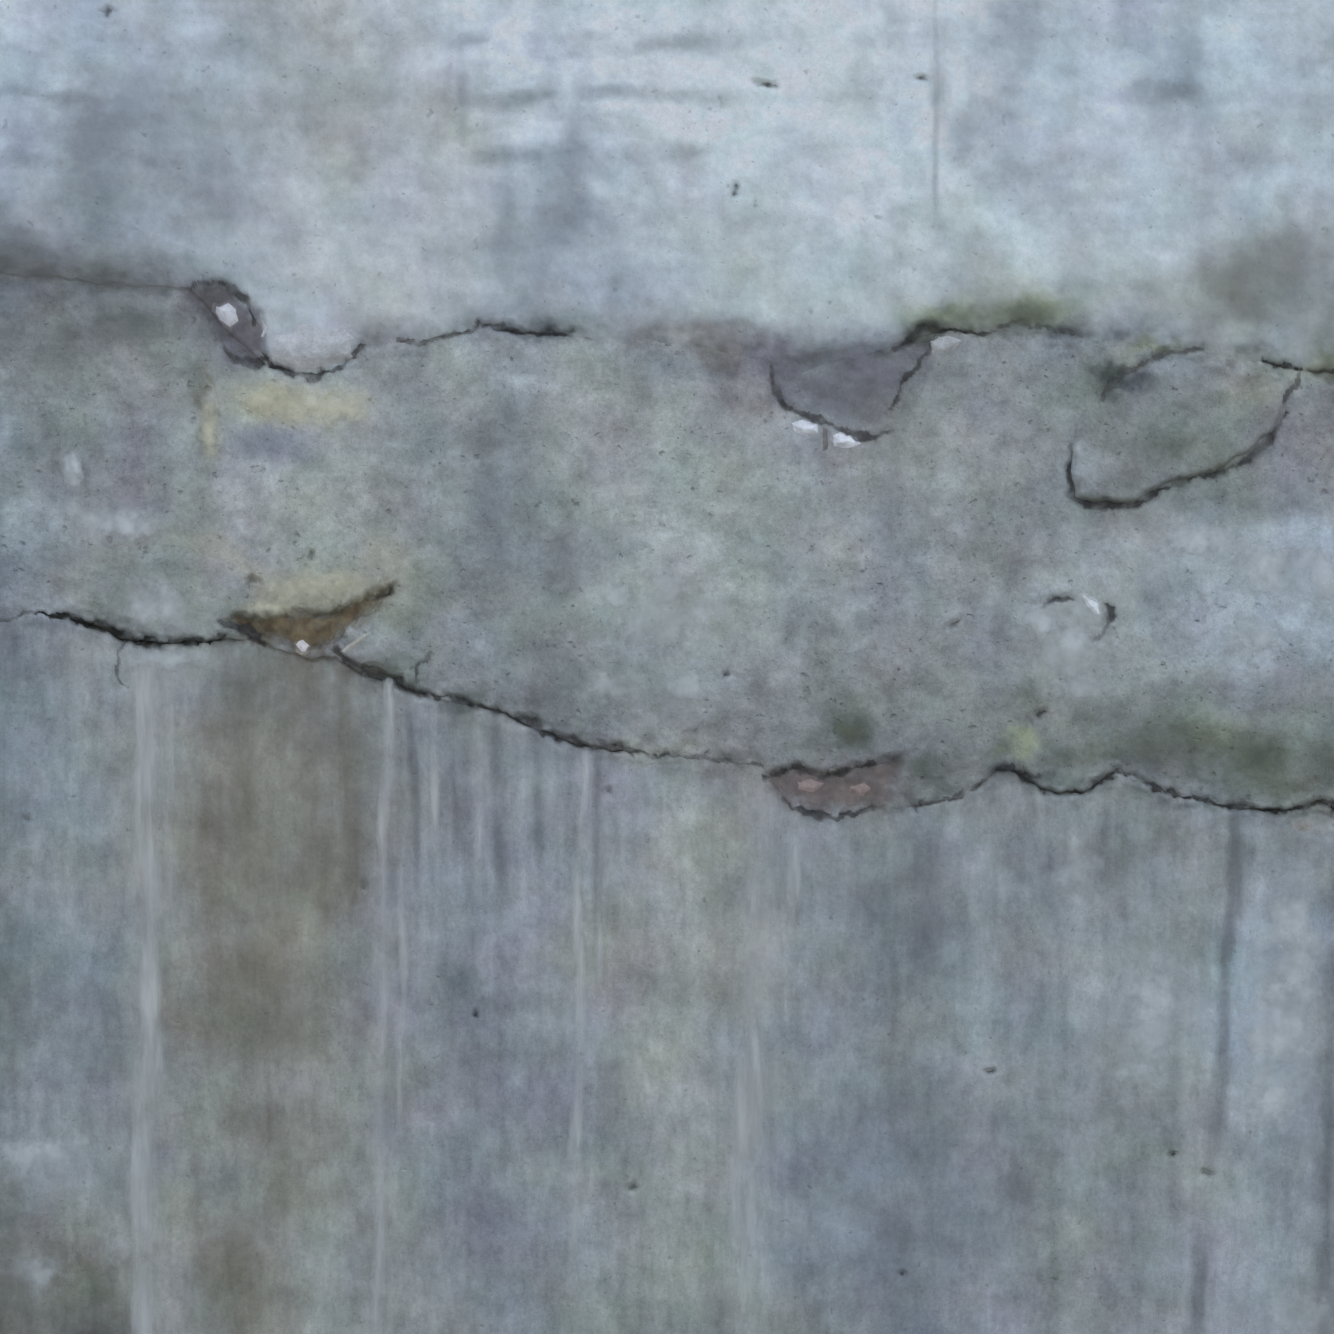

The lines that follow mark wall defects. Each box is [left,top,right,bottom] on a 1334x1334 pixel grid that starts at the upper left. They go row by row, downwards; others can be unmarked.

spalling [191,280,364,382]
spalling [770,336,961,451]
crack [1067,357,1334,509]
crack [21,611,227,682]
spalling [218,587,391,656]
crack [334,650,668,758]
leakage [1026,610,1096,696]
spalling [762,760,897,821]
crack [919,763,1334,821]
leakage [141,934,160,1091]
leakage [1116,974,1178,1082]
leakage [1244,897,1319,1122]